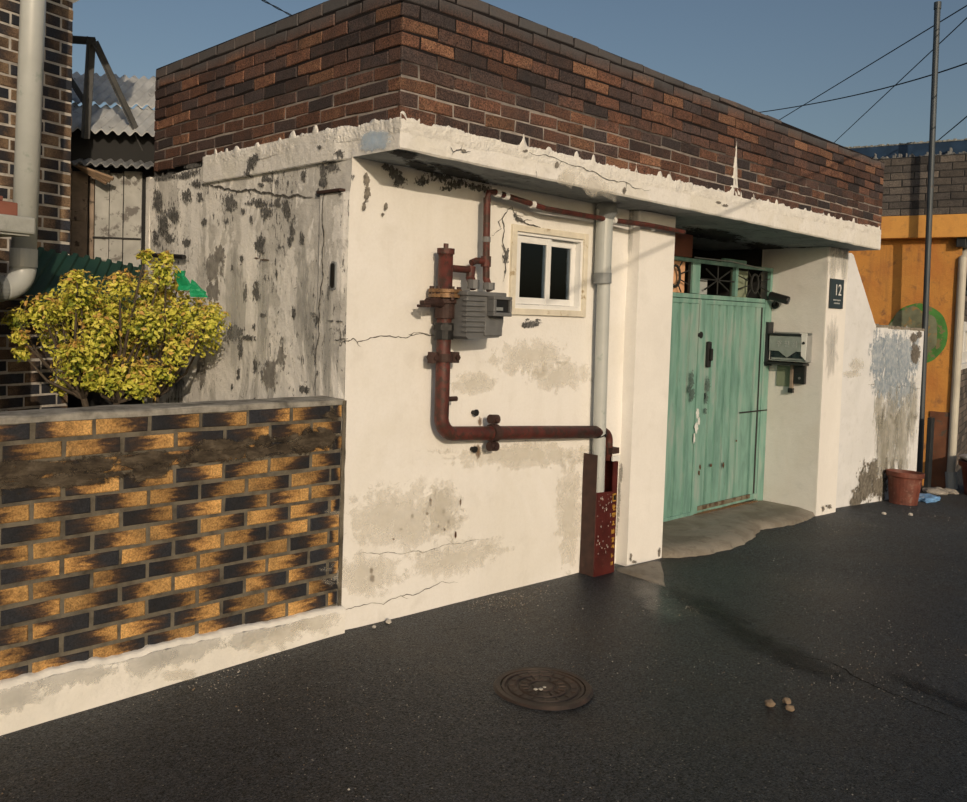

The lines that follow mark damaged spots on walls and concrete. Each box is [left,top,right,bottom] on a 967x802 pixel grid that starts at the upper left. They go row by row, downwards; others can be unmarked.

peeling [382,163,492,193]
crack [493,208,541,281]
crack [203,181,433,385]
leakage [171,342,184,400]
peeling [688,370,711,443]
peeling [869,326,922,423]
spalling [0,408,340,495]
crack [346,581,458,610]